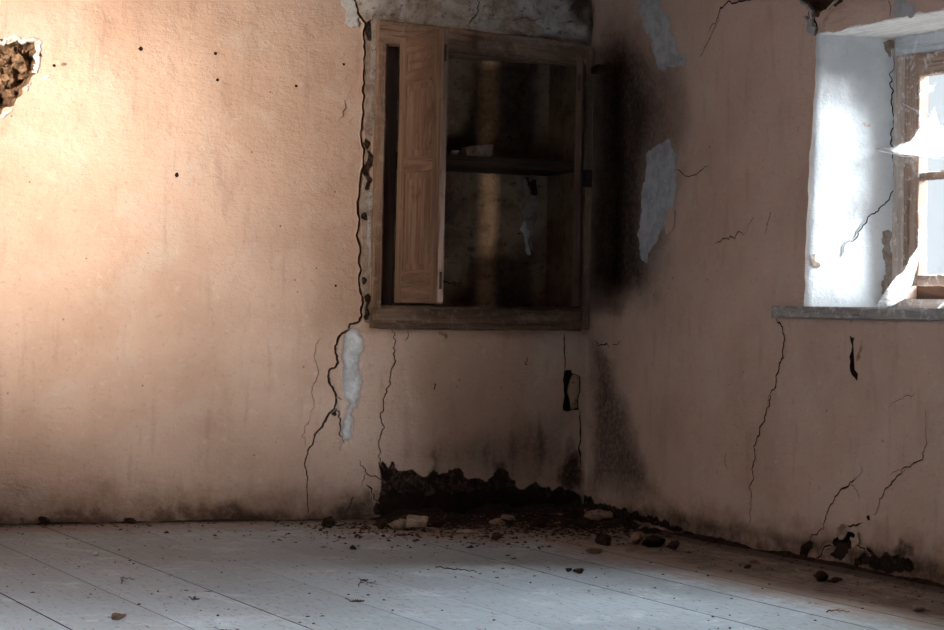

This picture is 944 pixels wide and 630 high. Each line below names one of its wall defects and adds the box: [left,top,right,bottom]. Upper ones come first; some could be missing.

flaking render [0,34,49,118]
peeling [638,0,687,72]
crack [700,0,753,57]
flaking render [799,0,843,36]
crack [301,0,409,513]
peeling [341,0,378,439]
peeling [637,139,677,263]
flaking render [563,370,581,411]
crack [749,318,786,525]
crack [822,391,928,531]
flaking render [799,521,871,560]
leakage [850,540,935,574]